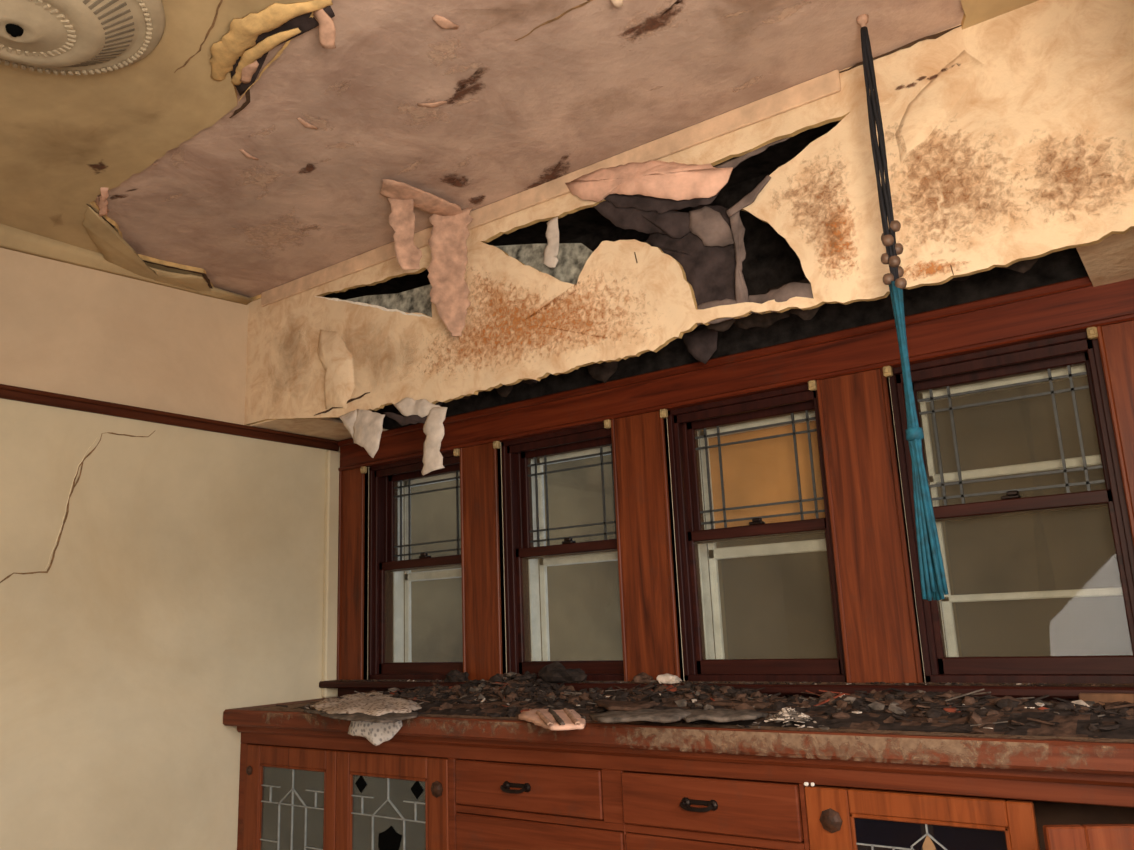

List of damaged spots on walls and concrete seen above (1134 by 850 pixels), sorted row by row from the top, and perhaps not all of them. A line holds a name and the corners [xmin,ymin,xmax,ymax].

crack [174,0,223,73]
spalling [82,0,964,336]
damp [792,172,841,246]
damp [909,135,1004,233]
damp [1041,149,1134,206]
crack [0,430,156,583]